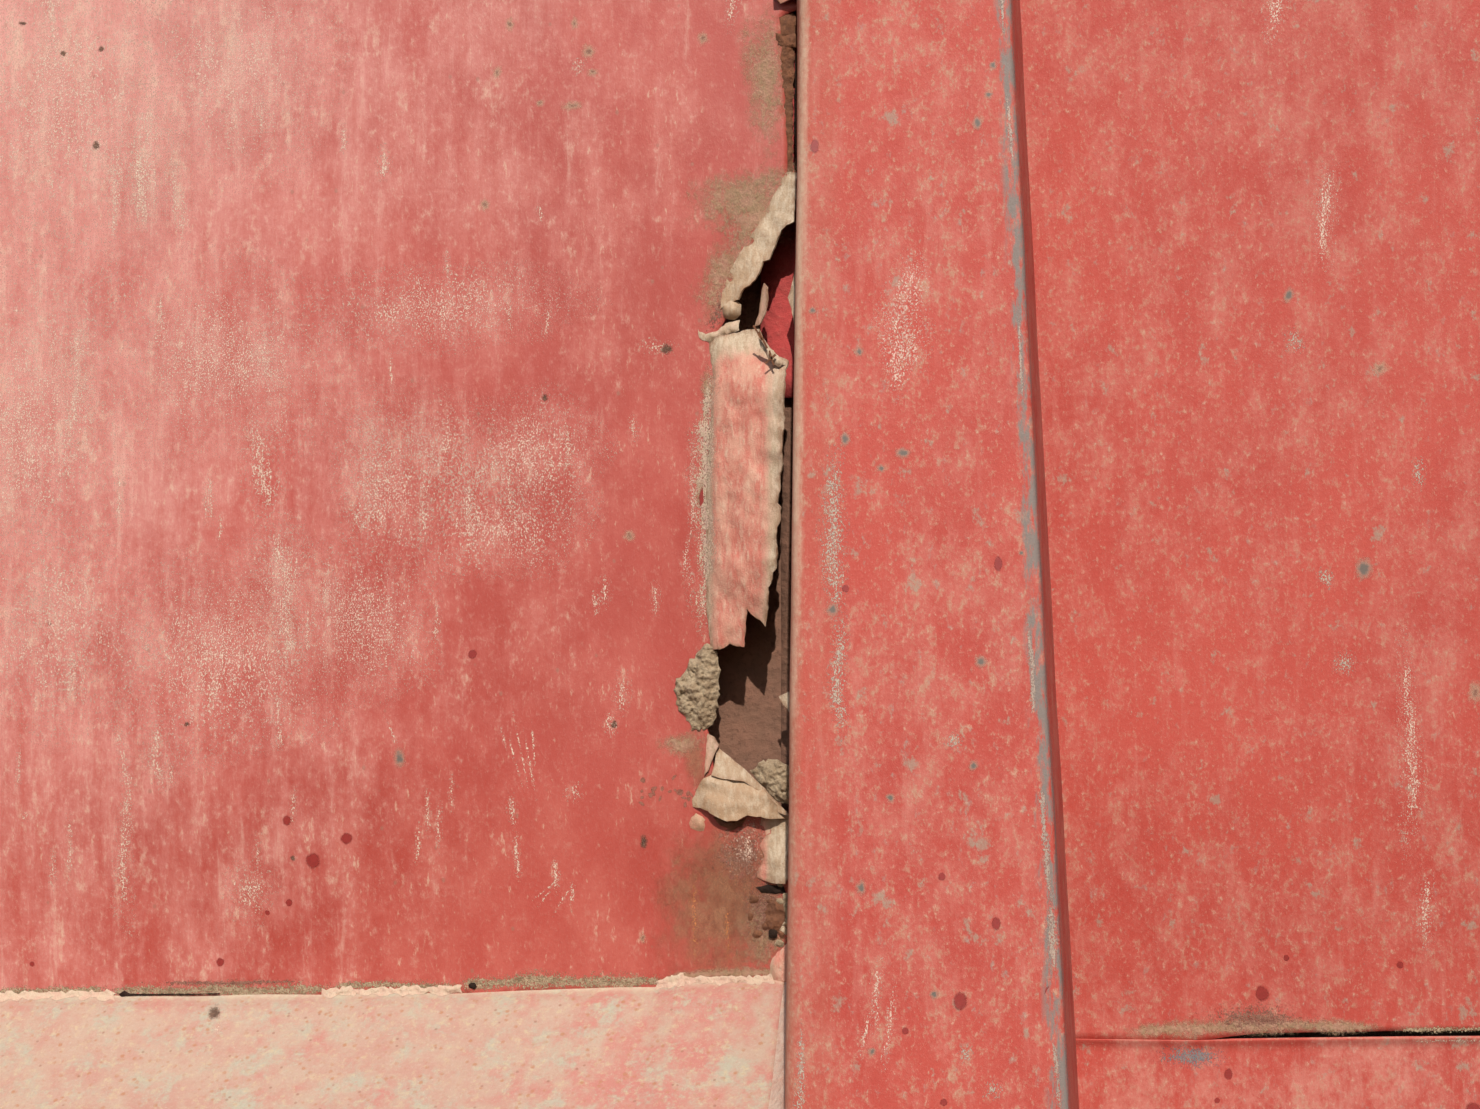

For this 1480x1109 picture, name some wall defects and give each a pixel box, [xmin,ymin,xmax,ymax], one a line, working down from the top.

peeling [682,329,789,650]
peeling [757,817,789,884]